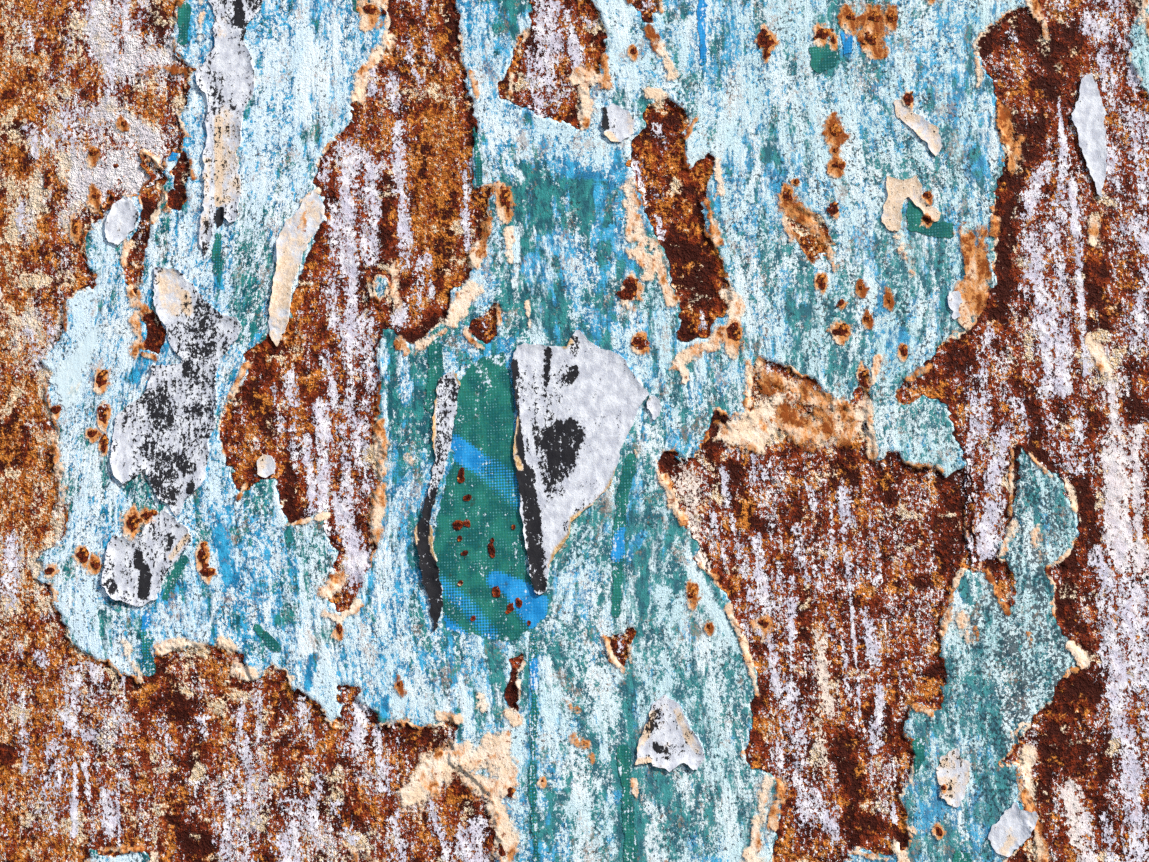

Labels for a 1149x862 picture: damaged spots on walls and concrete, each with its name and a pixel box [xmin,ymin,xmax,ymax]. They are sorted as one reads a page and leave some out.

peeling [195,0,263,274]
peeling [268,190,325,346]
corrosion [498,0,613,131]
peeling [1071,73,1107,197]
peeling [101,267,242,676]
corrosion [0,0,526,862]
peeling [414,330,662,862]
corrosion [616,0,1149,862]
peeling [617,695,705,862]